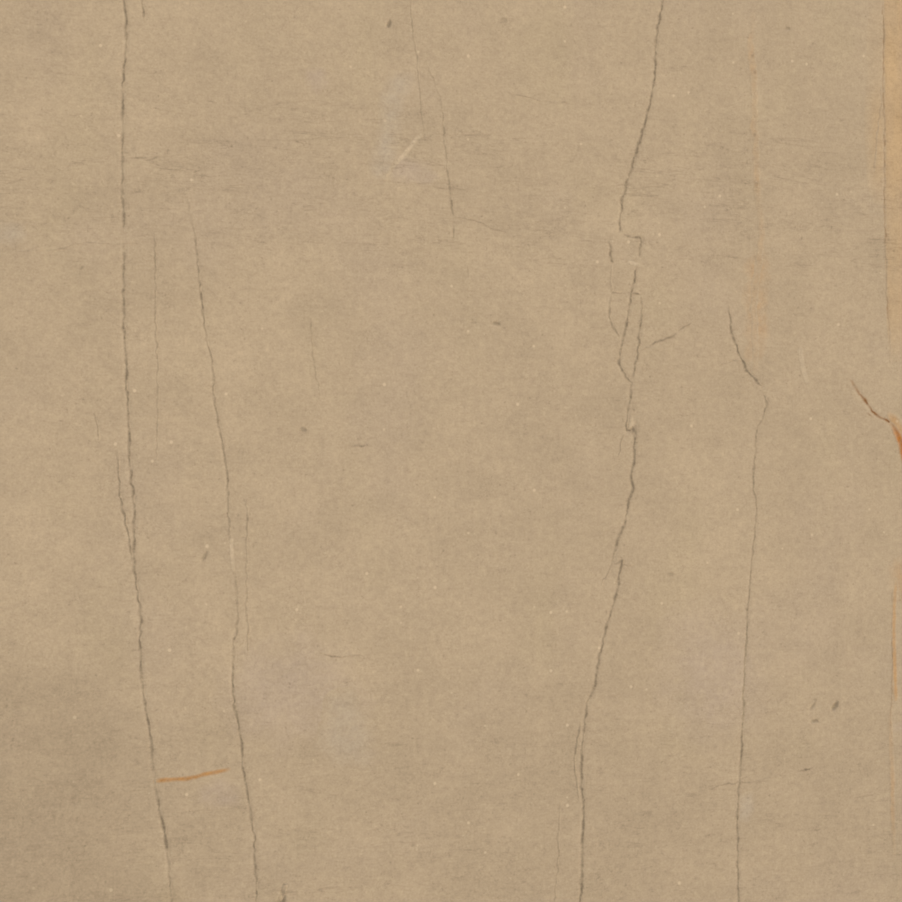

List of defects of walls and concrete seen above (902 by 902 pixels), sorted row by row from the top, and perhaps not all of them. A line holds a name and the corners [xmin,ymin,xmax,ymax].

damp [0,651,193,902]
crack [94,0,173,902]
rust [153,767,231,783]
crack [185,196,259,902]
crack [553,0,694,902]
crack [708,304,770,902]